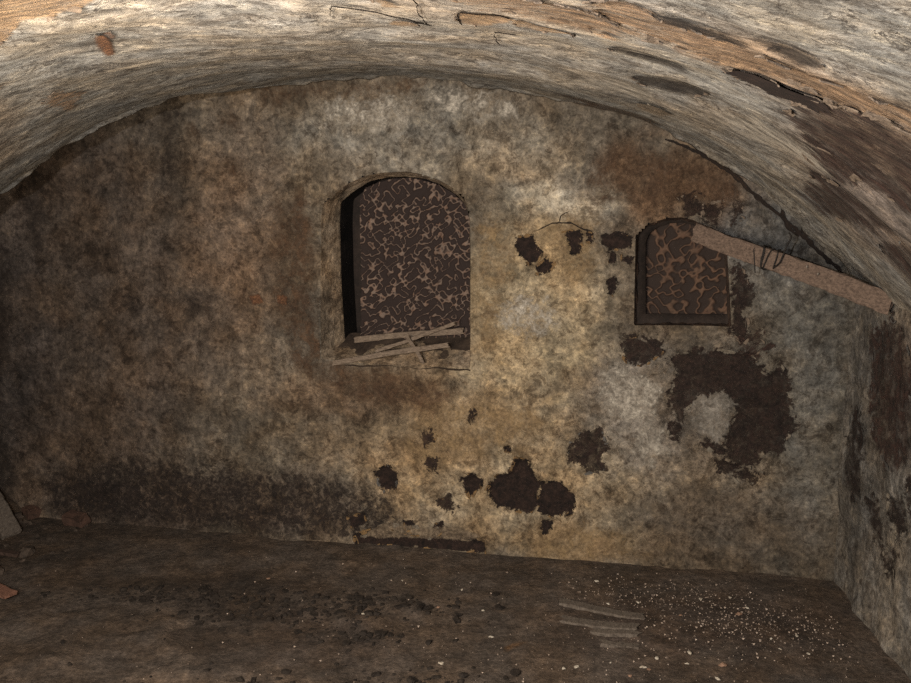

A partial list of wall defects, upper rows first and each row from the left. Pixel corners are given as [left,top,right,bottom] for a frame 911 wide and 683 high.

peeling [0,0,93,46]
spalling [94,31,114,57]
peeling [448,0,911,280]
leakage [730,116,826,172]
spalling [606,276,619,297]
leakage [690,392,731,443]